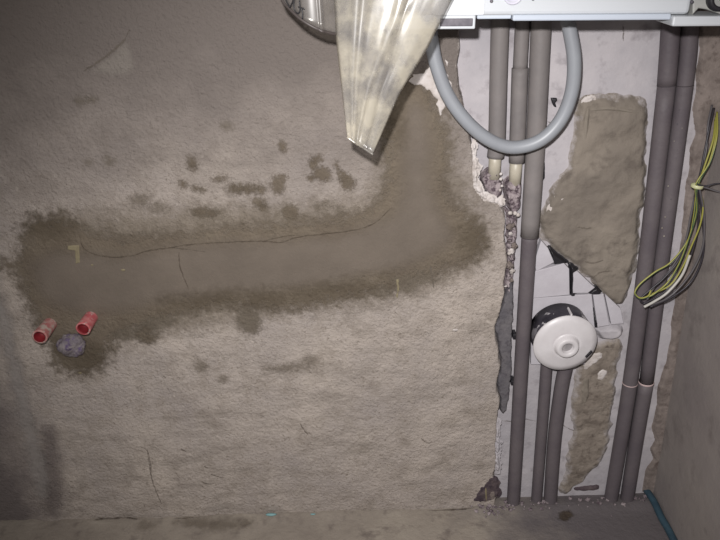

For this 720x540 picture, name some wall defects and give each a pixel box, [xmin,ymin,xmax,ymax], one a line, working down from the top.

damp [0,75,489,375]
spalling [471,139,520,502]
peeling [581,352,602,403]
peeling [642,26,720,493]